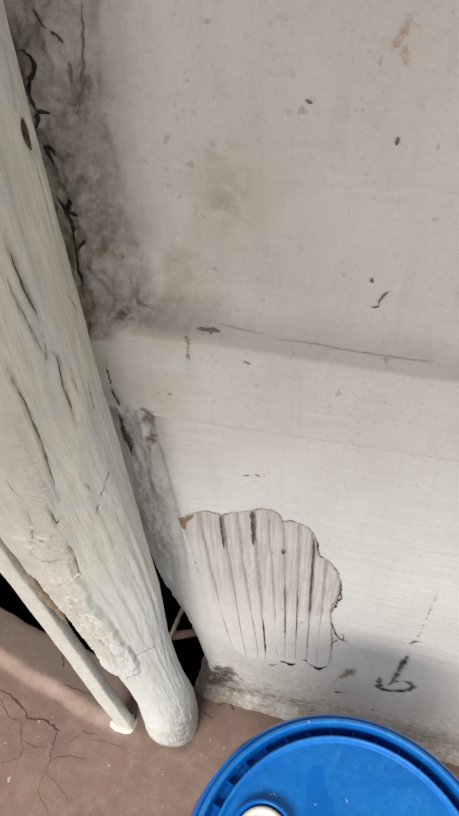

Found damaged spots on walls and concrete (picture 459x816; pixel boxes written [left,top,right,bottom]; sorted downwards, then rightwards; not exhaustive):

crack [33,4,86,119]
crack [11,50,85,305]
crack [196,323,432,363]
spalling [178,508,342,667]
leakage [207,666,242,686]
crack [0,690,114,816]